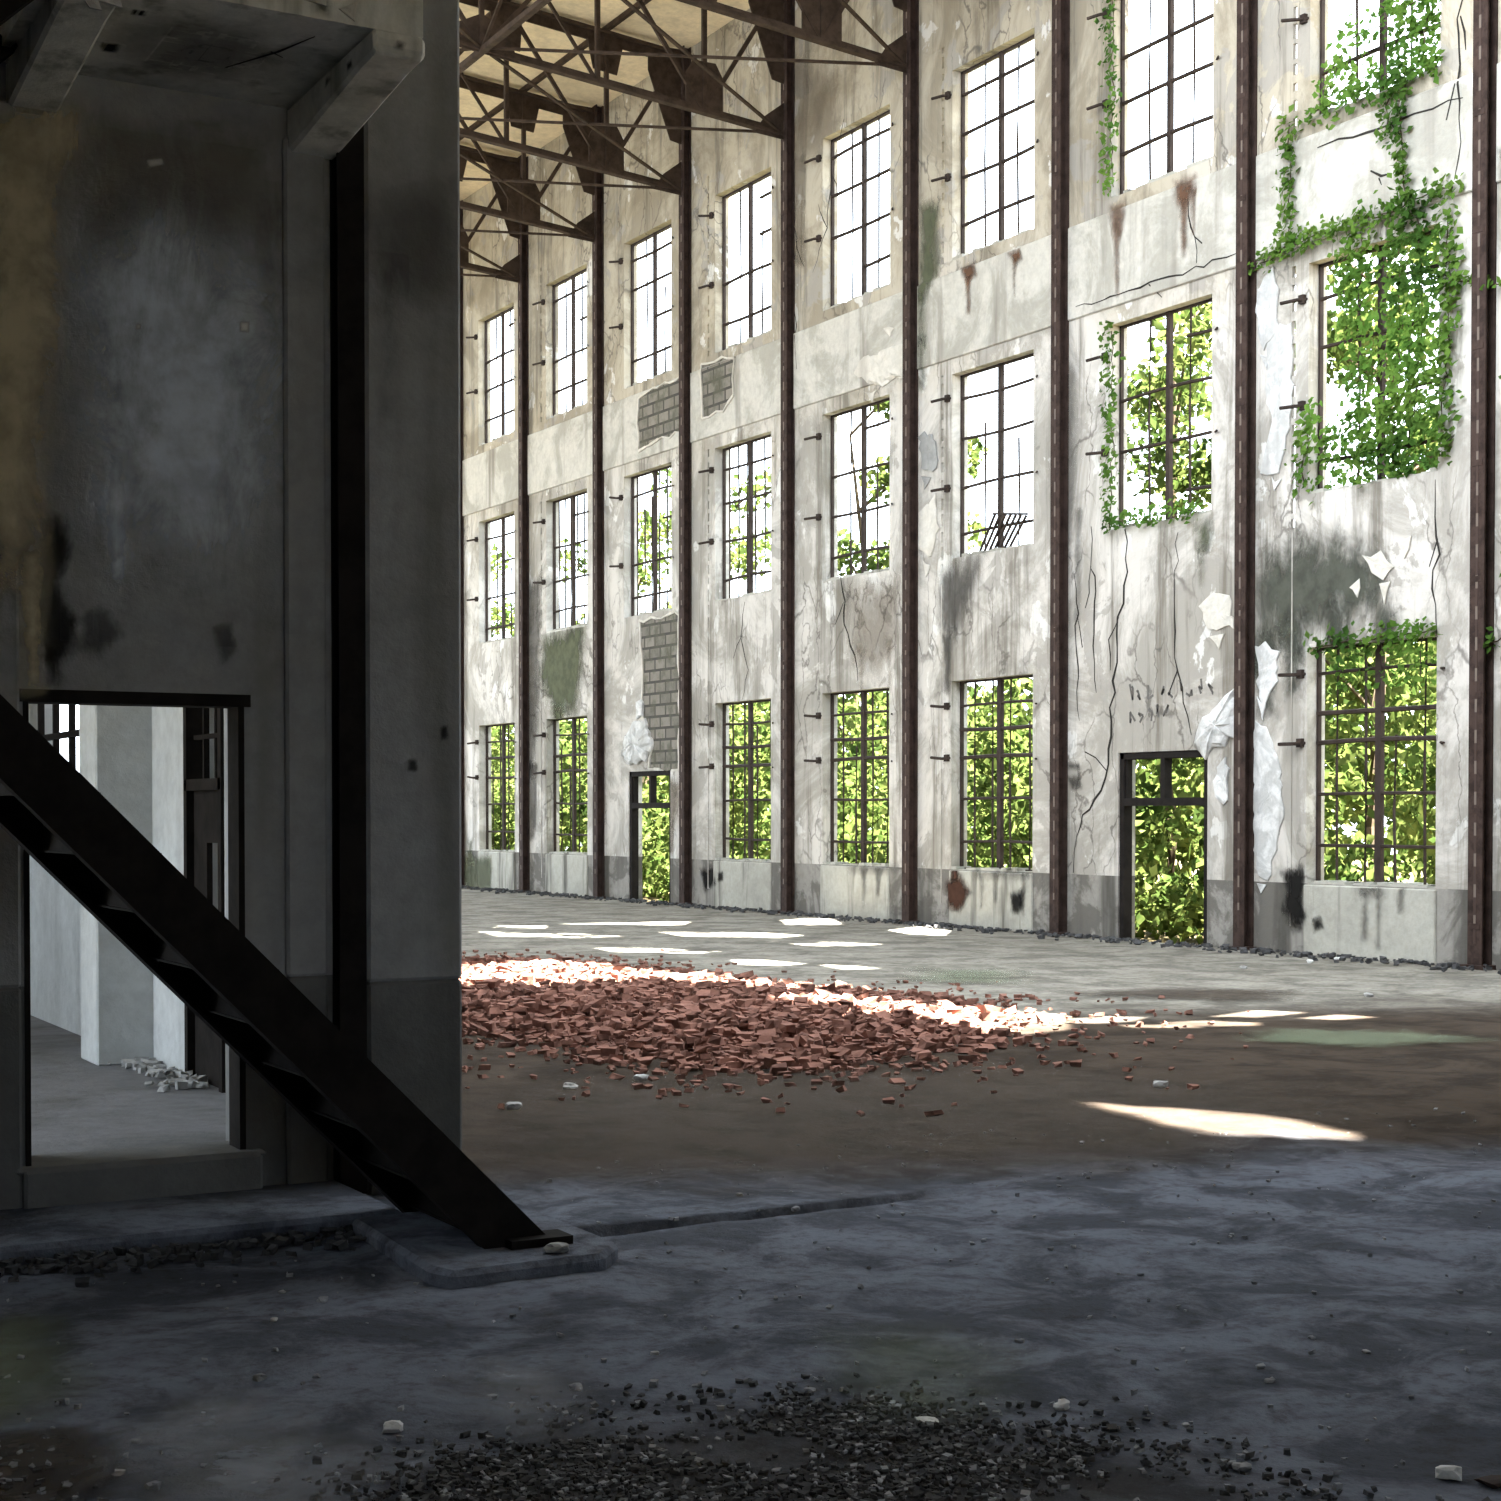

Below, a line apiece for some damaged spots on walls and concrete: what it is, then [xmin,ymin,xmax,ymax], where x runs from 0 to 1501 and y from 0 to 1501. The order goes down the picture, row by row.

corrosion [1176,179,1195,248]
water stain [0,112,78,685]
flaking render [636,376,679,453]
flaking render [699,356,736,419]
flaking render [638,610,679,771]
crack [1073,527,1128,873]
crack [1169,533,1191,733]
flaking render [1193,689,1234,805]
flaking render [1199,593,1234,649]
flaking render [1253,641,1323,929]